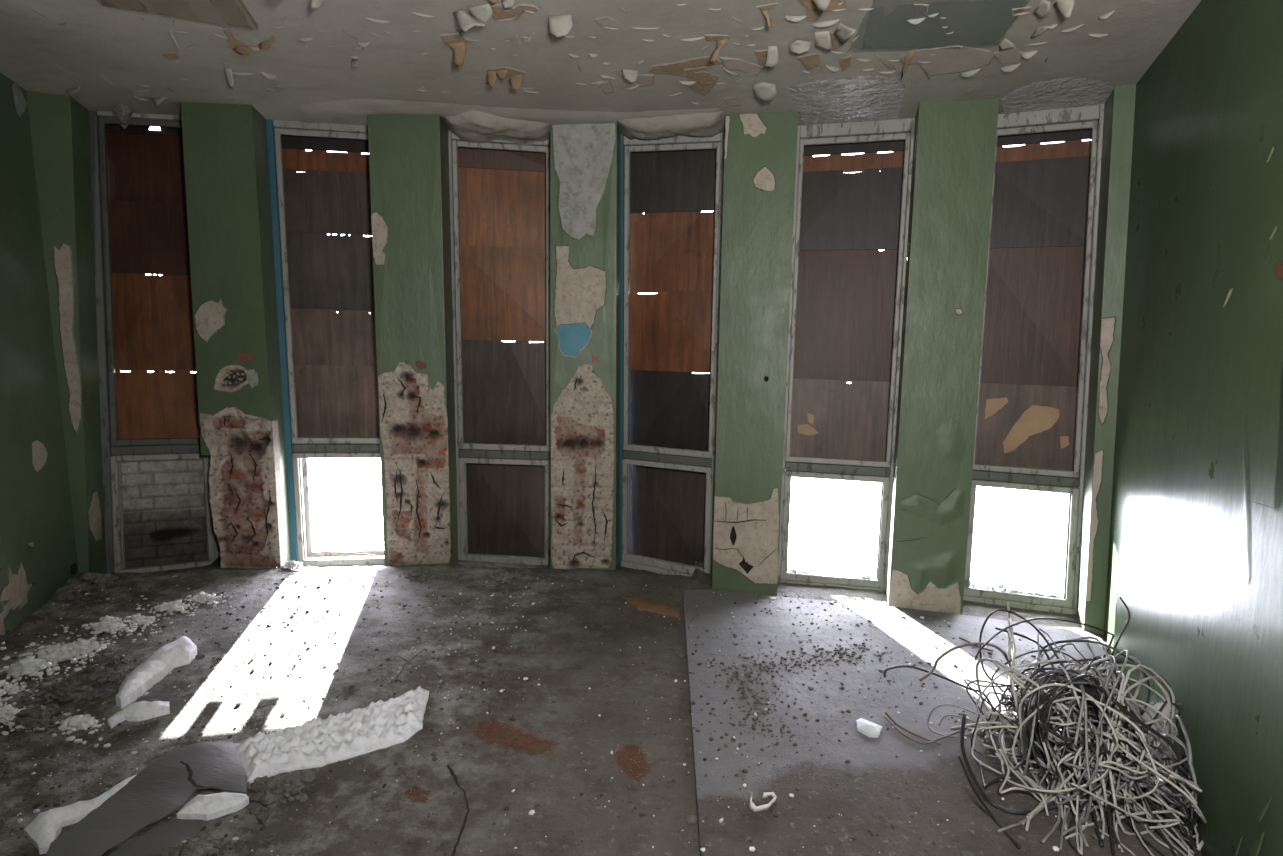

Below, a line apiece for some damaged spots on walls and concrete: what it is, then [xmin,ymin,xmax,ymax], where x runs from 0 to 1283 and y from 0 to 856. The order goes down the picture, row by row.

peeling [440,0,1115,160]
peeling [371,211,389,266]
peeling [551,123,617,330]
peeling [53,242,82,434]
peeling [194,299,228,343]
peeling [0,561,37,637]
spalling [200,365,286,569]
spalling [378,360,451,566]
spalling [551,364,615,569]
crack [713,503,776,565]
flaking render [713,487,780,612]
peeling [888,569,962,615]